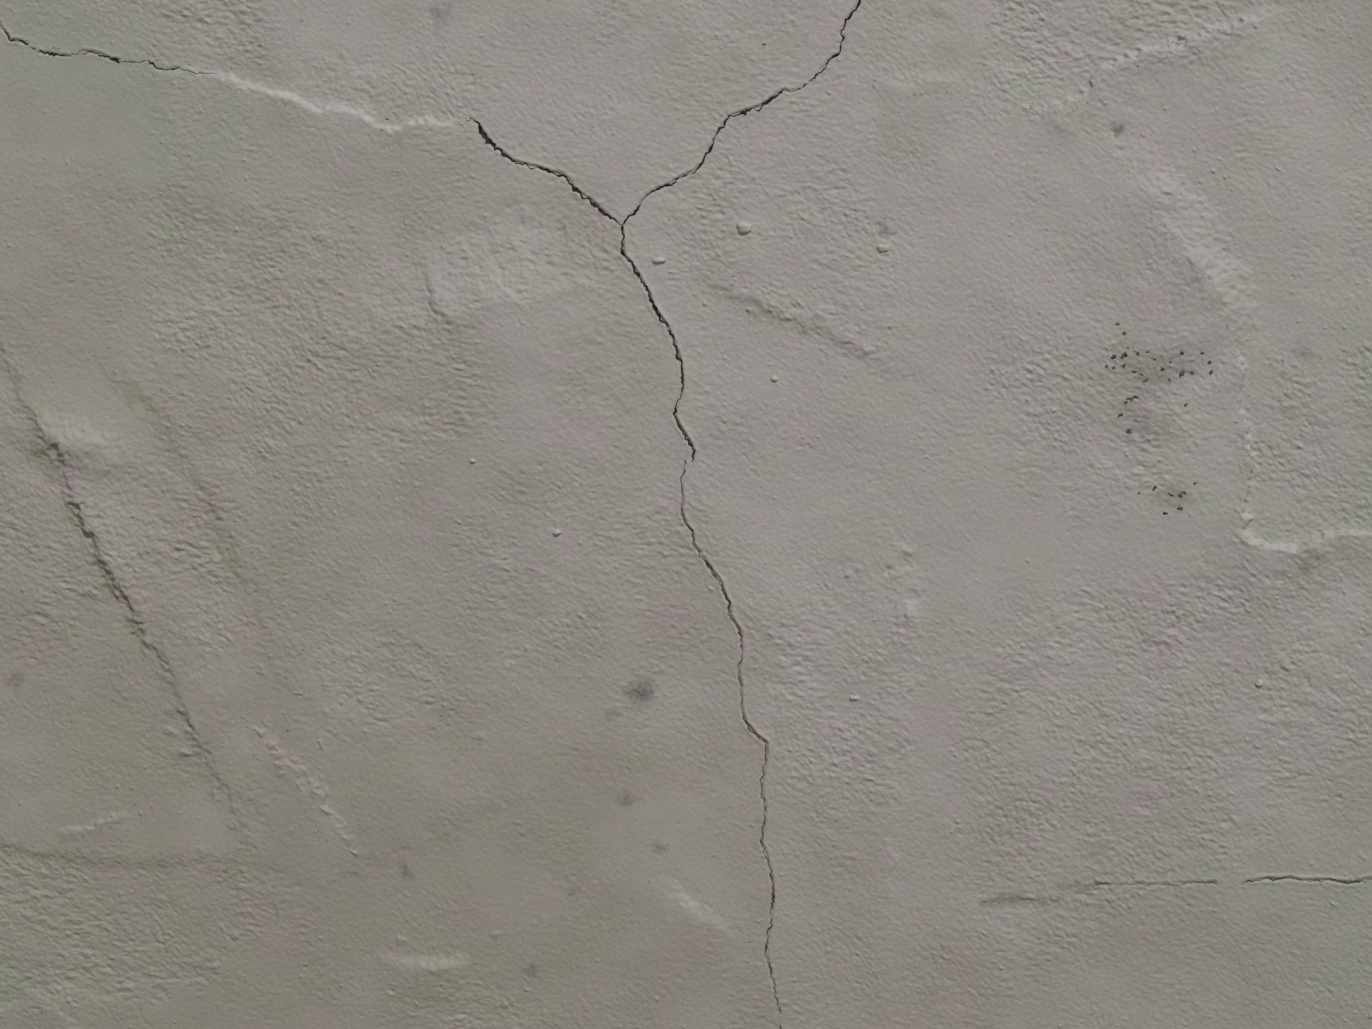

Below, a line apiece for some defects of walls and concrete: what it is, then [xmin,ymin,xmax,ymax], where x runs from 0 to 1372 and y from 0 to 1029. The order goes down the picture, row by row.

crack [0,21,215,74]
crack [465,0,861,1028]
crack [1087,874,1371,887]